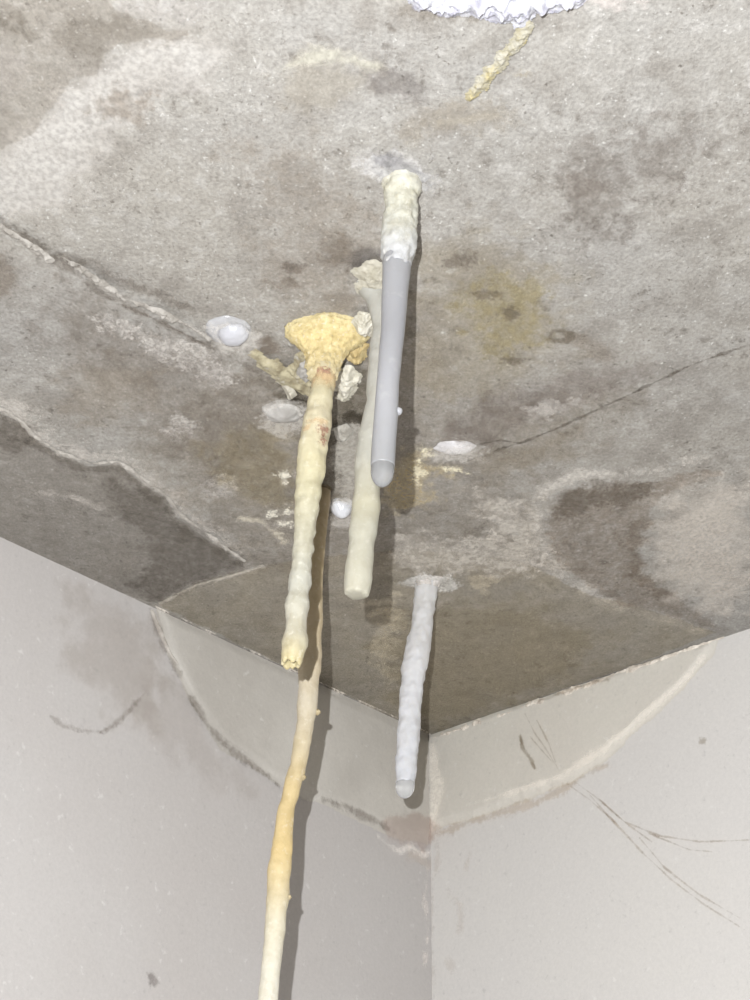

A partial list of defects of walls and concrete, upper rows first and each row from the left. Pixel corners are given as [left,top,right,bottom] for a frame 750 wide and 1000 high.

crack [0,223,212,342]
peeling [0,407,246,562]